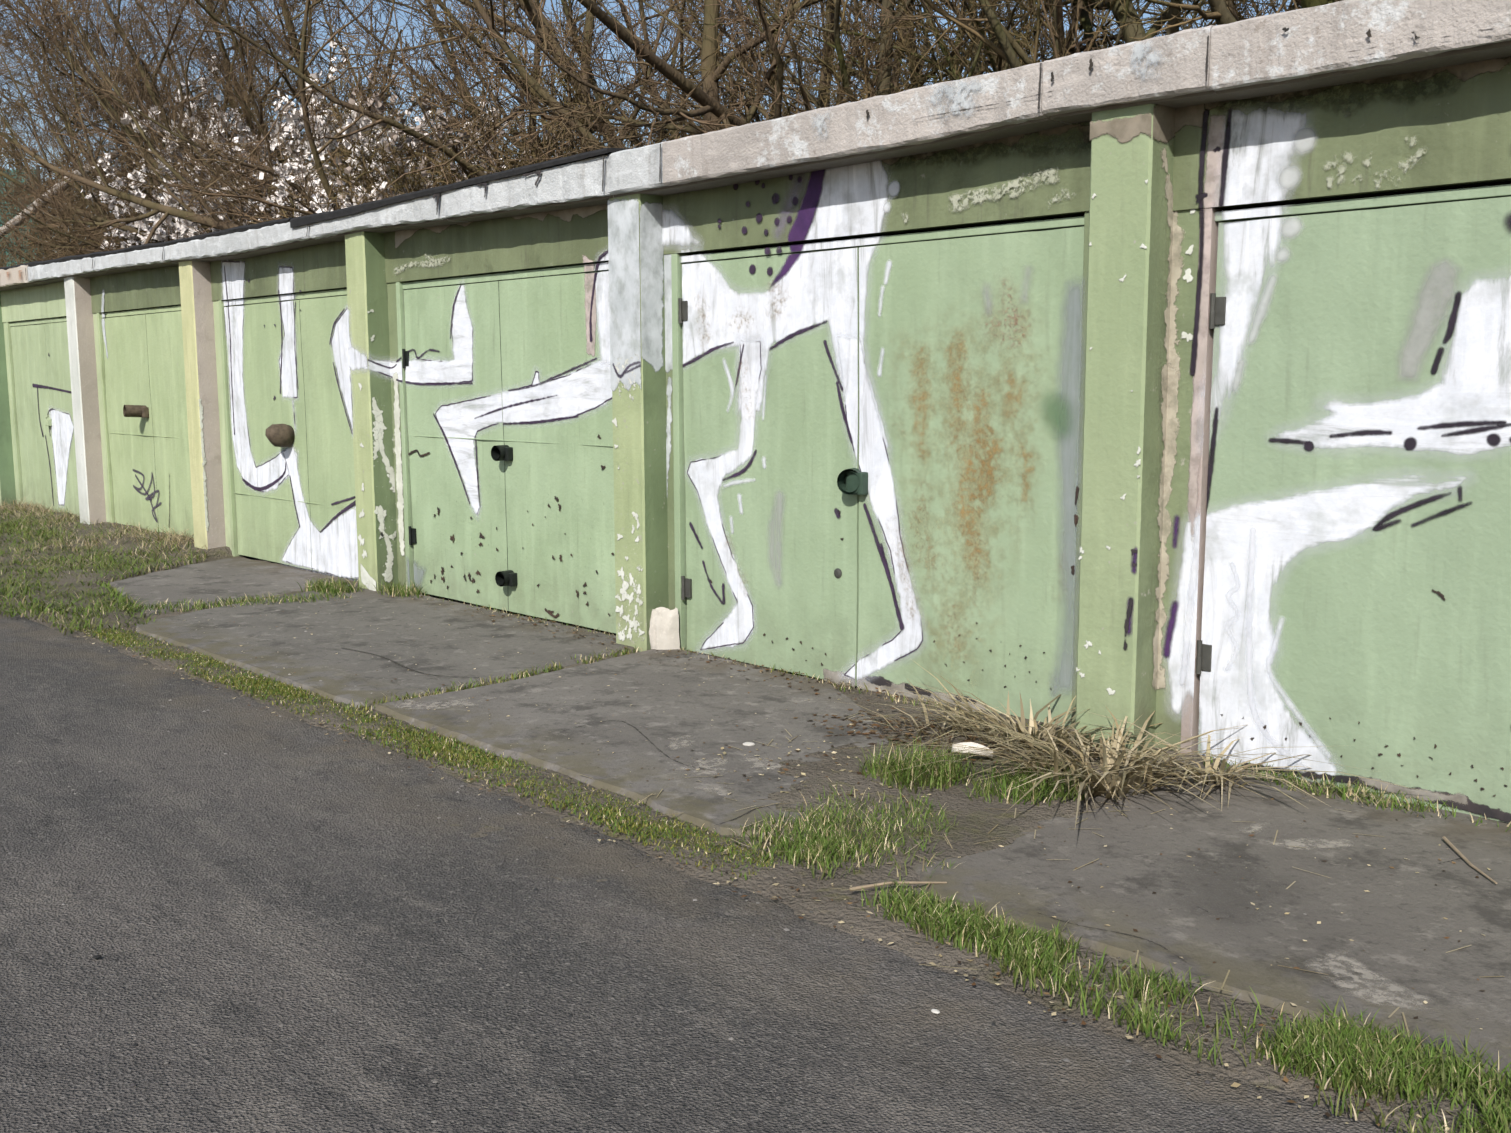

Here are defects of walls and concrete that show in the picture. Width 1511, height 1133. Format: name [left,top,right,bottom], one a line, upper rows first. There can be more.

peeling [950,169,1070,211]
rust [951,339,999,566]
peeling [430,517,518,594]
peeling [608,512,645,641]